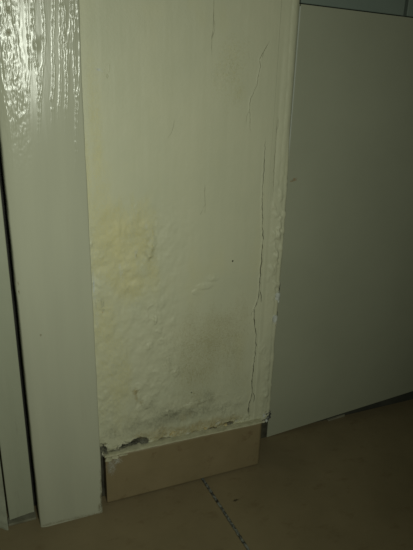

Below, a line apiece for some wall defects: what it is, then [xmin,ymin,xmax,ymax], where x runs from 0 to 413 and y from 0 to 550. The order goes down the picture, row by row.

crack [248,117,278,411]
spalling [100,410,271,476]